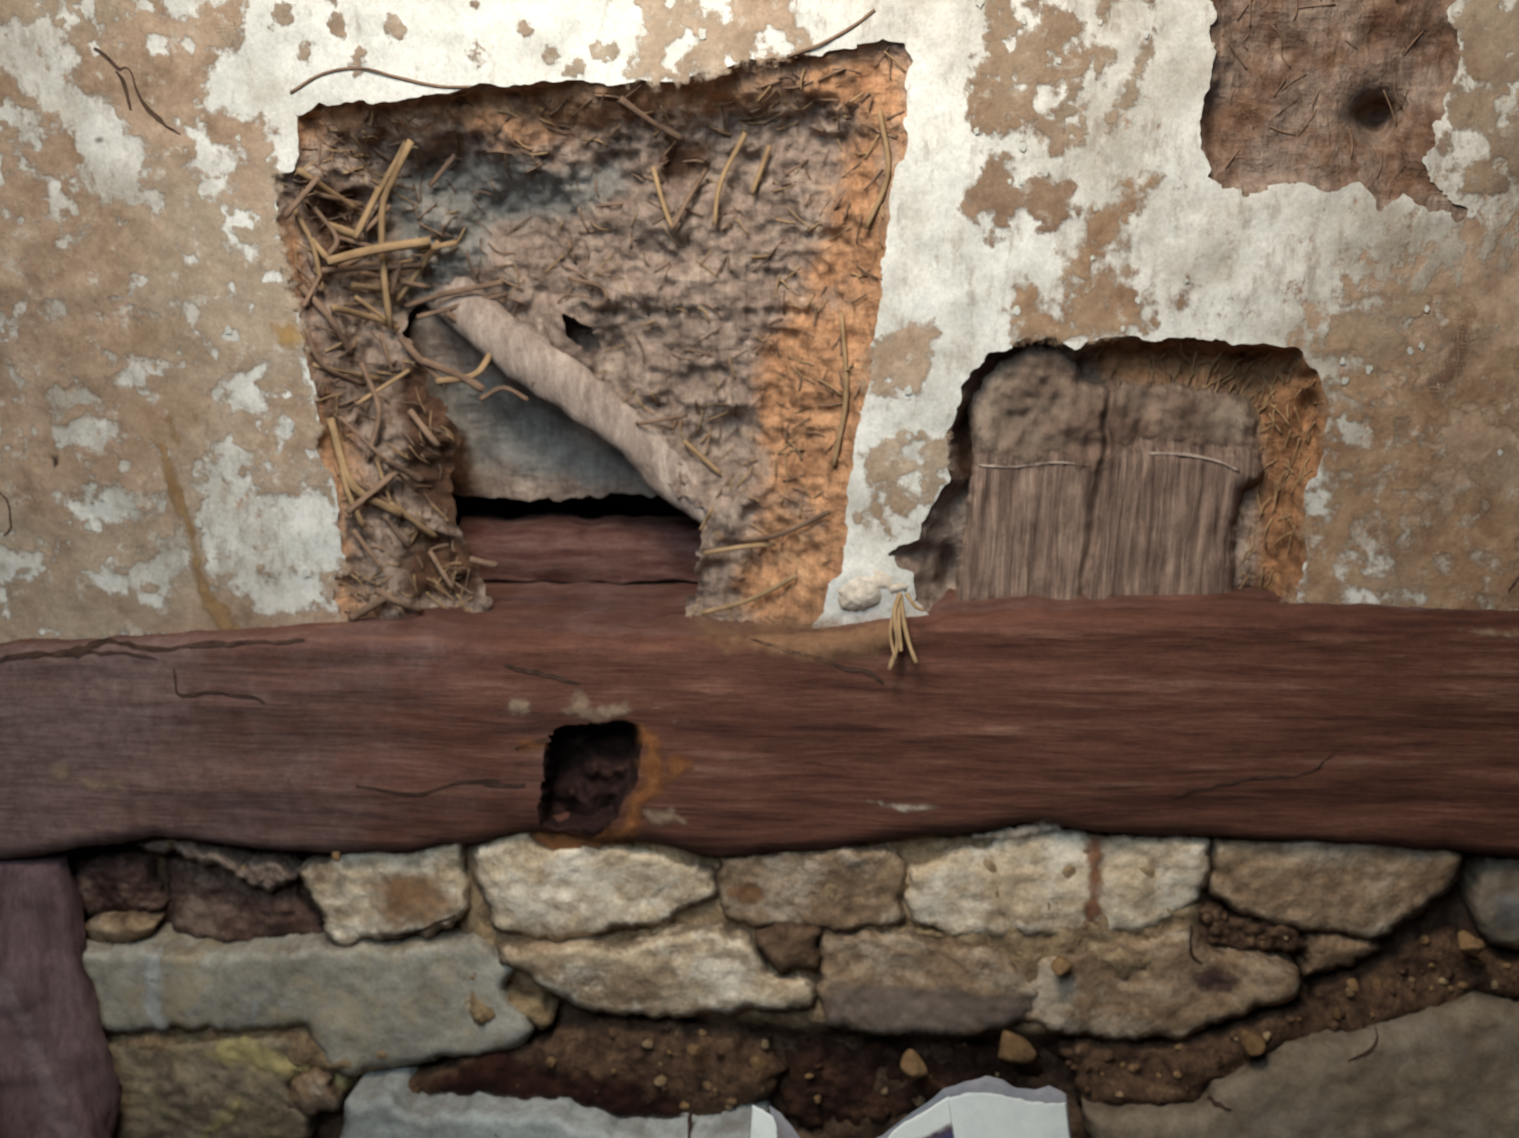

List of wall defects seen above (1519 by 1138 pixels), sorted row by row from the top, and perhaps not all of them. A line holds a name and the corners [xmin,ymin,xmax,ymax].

spalling [0,0,1519,643]
crack [0,638,305,705]
rust [536,728,691,851]